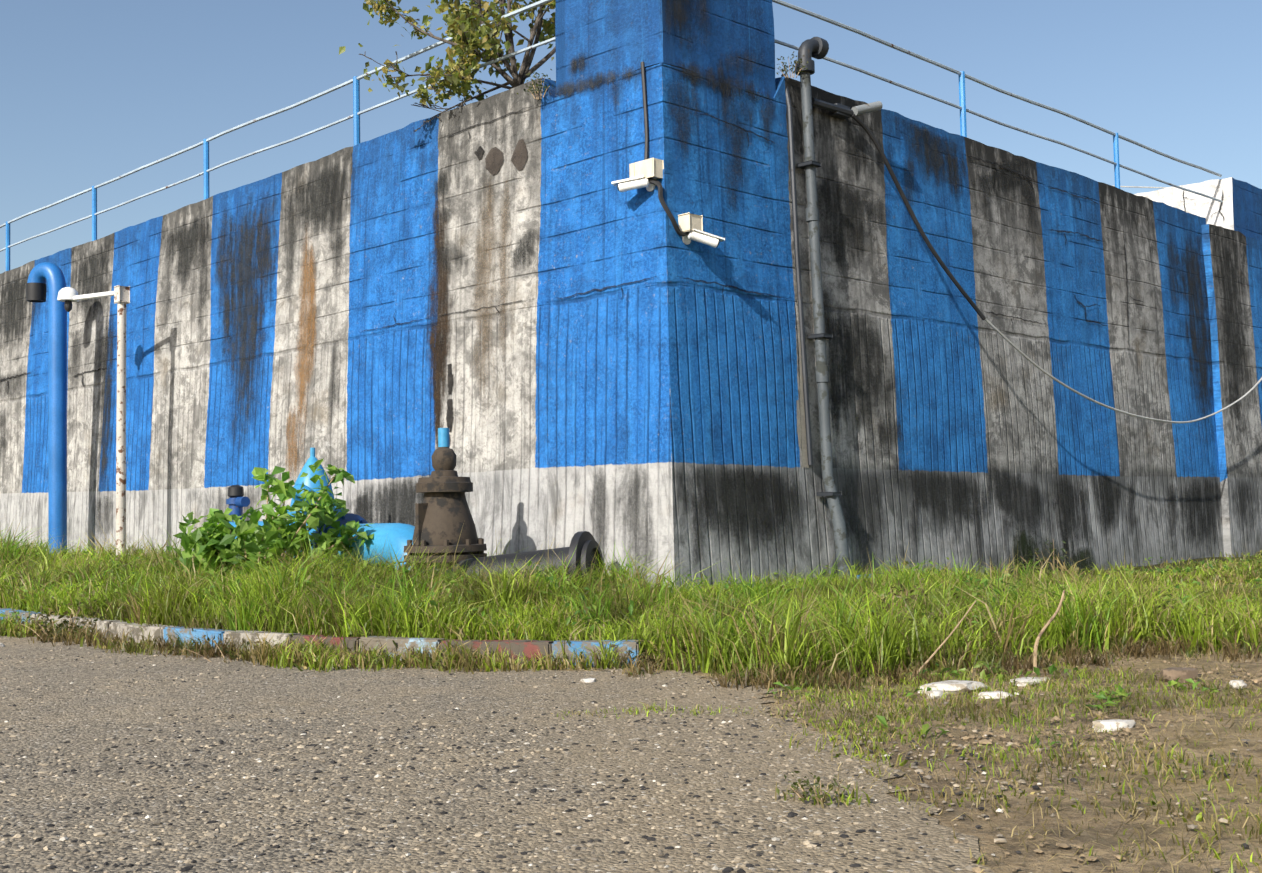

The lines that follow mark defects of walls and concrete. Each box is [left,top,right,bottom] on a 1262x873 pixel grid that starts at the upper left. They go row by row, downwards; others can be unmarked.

water stain [167,165,354,430]
corrosion [286,237,316,470]
water stain [427,173,462,446]
water stain [476,195,535,381]
water stain [806,181,883,267]
water stain [824,294,898,449]
crack [969,156,1143,344]
water stain [1167,237,1252,431]
water stain [681,466,808,544]
water stain [844,479,884,569]
water stain [897,467,1136,562]
water stain [1169,479,1220,544]